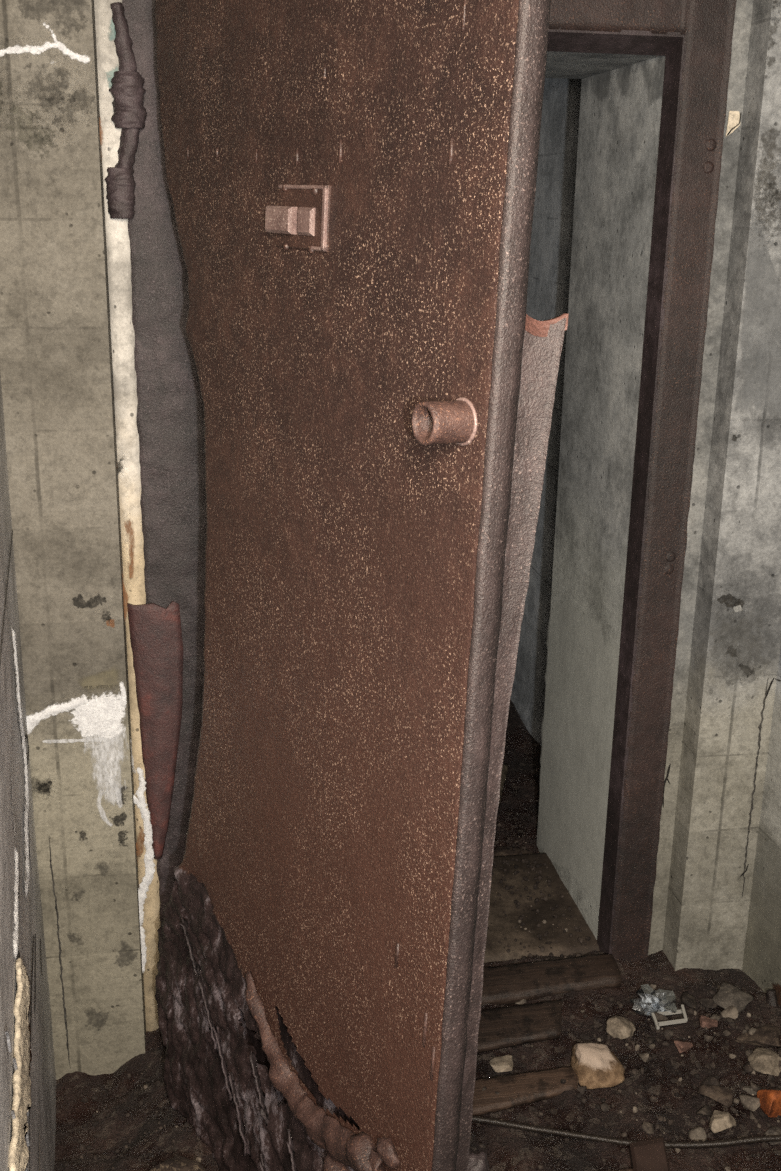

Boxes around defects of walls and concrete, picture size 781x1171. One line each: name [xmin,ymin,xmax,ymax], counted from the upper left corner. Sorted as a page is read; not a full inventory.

crack [0,23,90,64]
leakage [26,670,127,826]
crack [740,678,781,897]
spalling [5,949,32,1171]
rust [179,917,265,1171]
rust [286,1129,298,1171]